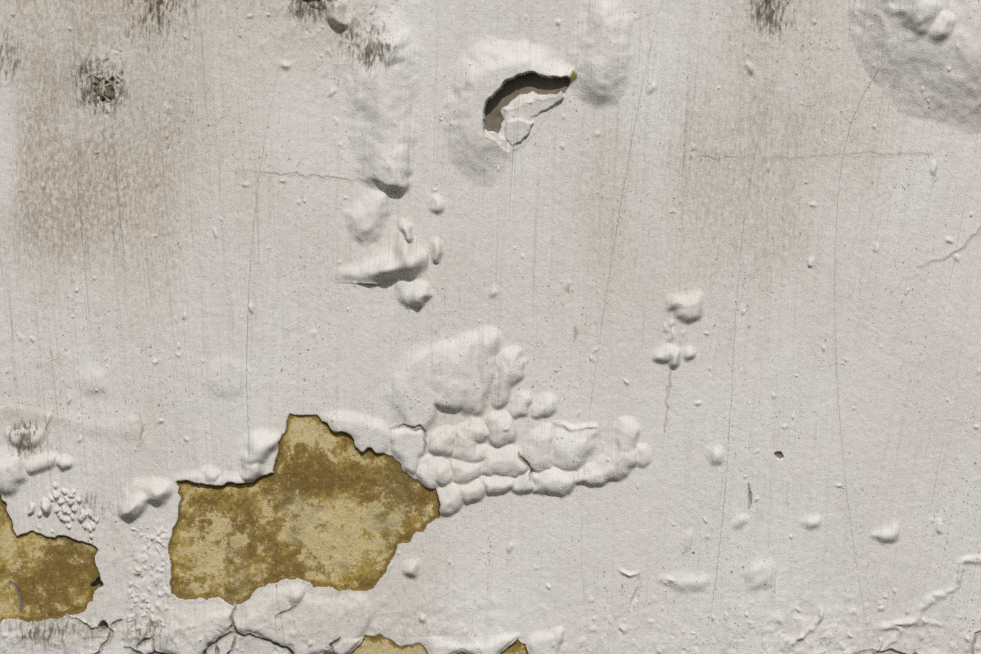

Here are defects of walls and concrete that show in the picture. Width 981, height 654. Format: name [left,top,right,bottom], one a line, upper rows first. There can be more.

peeling [117,411,440,606]
peeling [0,495,103,623]
peeling [334,634,428,654]
peeling [501,628,565,654]
crack [858,646,917,654]
crack [971,618,981,654]